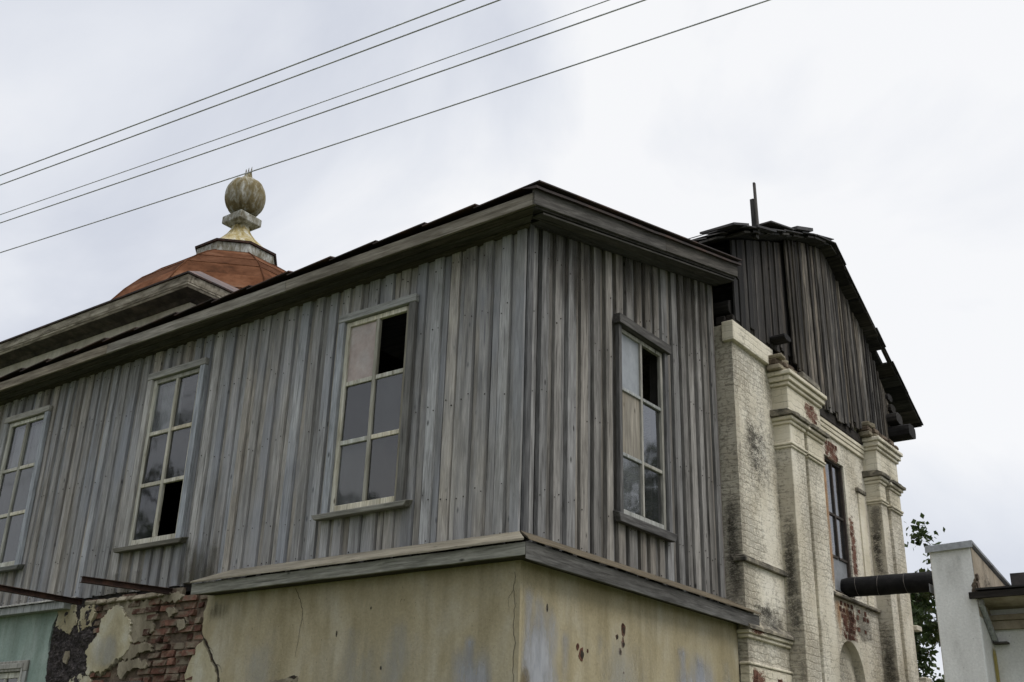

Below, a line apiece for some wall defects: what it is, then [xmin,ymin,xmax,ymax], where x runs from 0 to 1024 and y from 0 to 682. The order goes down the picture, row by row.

spalling [804,403,818,425]
spalling [824,439,838,463]
leakage [787,527,799,626]
spalling [849,517,858,577]
flaking render [56,587,219,682]
spalling [839,600,870,643]